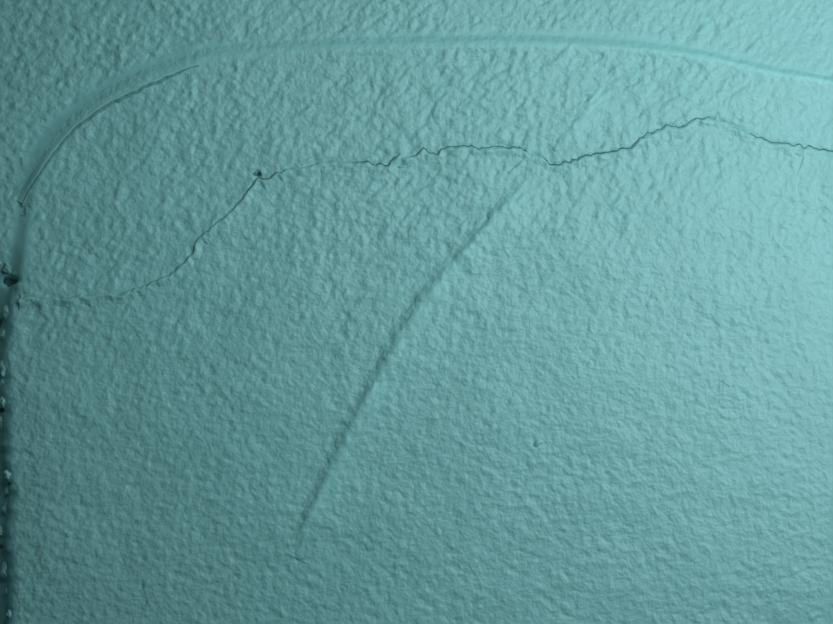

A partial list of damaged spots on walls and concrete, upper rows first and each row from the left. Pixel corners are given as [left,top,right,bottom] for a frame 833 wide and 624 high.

crack [17,62,201,206]
crack [18,112,833,310]